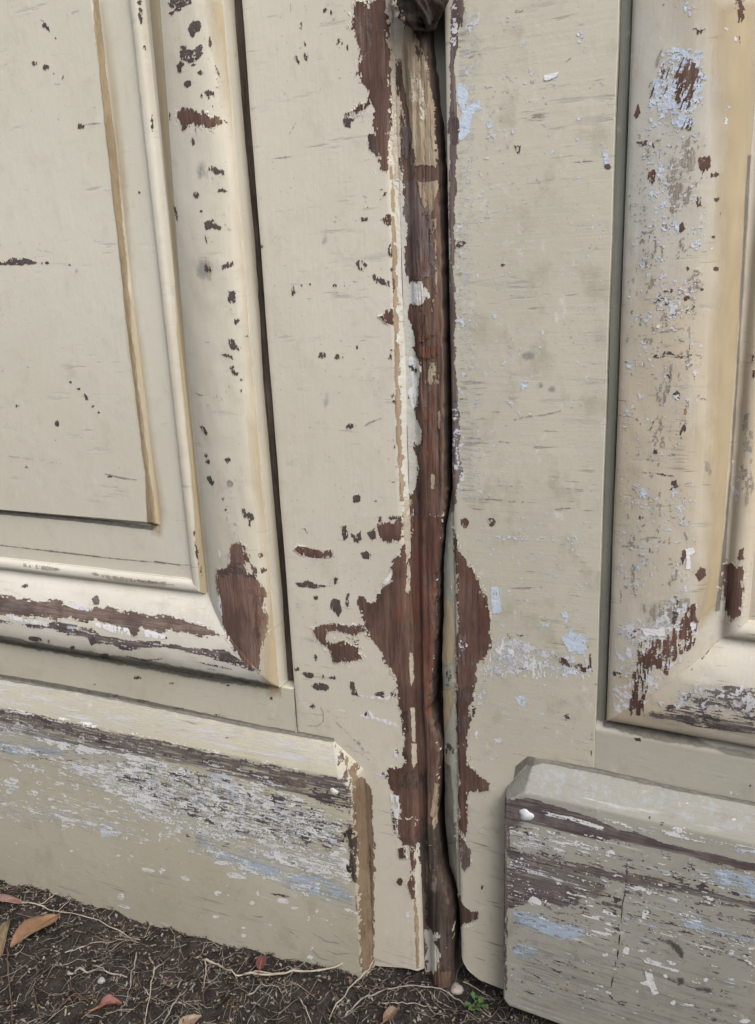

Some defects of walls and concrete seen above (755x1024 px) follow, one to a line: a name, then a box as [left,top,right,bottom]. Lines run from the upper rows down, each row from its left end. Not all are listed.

peeling [169,89,232,145]
peeling [0,537,272,677]
peeling [293,0,755,1024]
peeling [0,708,371,928]